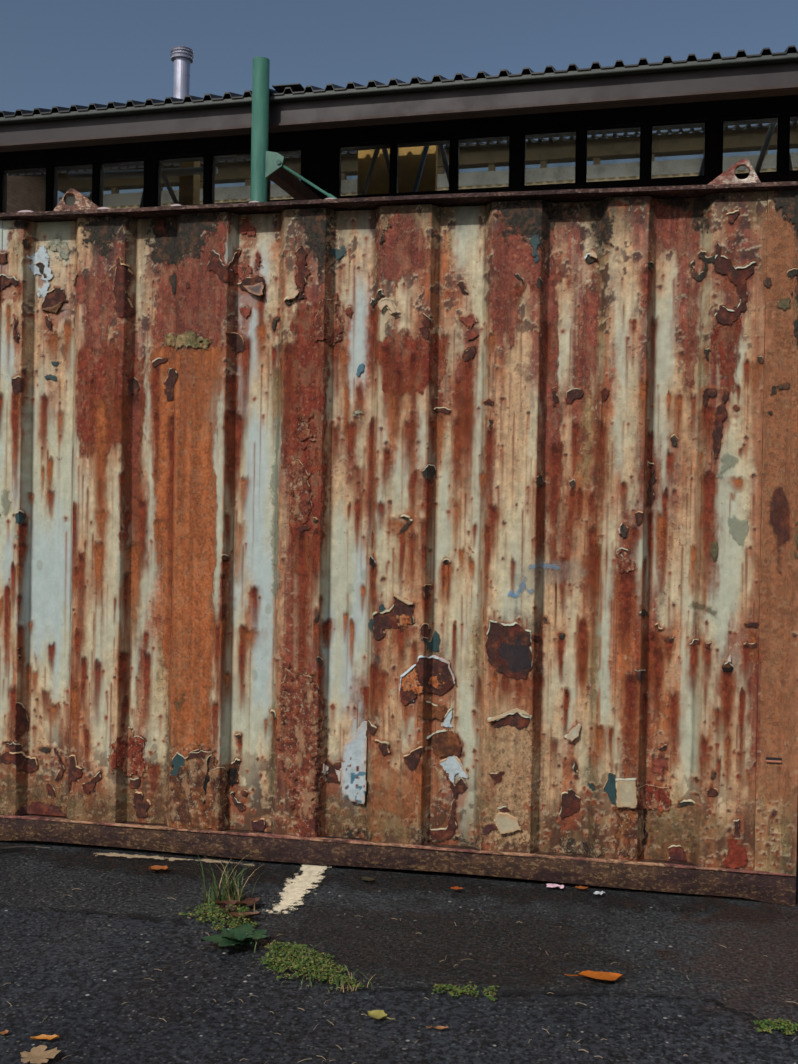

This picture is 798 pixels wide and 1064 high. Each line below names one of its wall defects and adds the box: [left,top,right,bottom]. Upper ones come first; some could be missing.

peeling [22,238,53,297]
rust [41,211,499,761]
rust [370,222,609,601]
rust [667,212,798,801]
rust [0,522,57,773]
rust [13,502,106,816]
peeling [212,758,247,797]
peeling [322,721,367,806]
peeling [421,628,455,684]
rust [425,620,544,848]
peeling [494,812,521,835]
peeling [588,772,669,809]